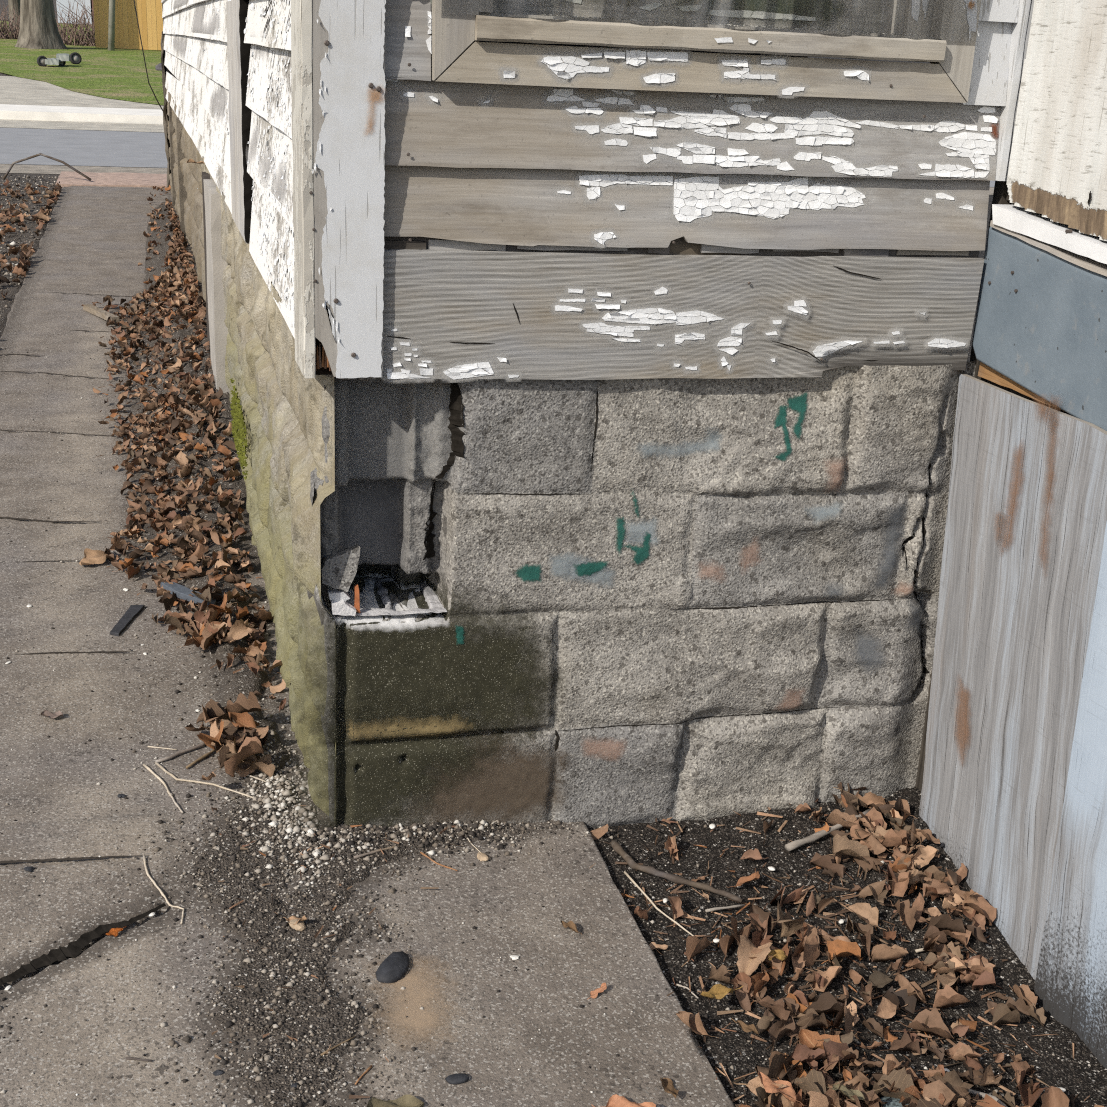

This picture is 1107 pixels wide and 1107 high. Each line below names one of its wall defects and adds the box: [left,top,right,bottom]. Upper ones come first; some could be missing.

peeling [538,38,1000,224]
peeling [553,285,752,372]
peeling [810,328,906,359]
peeling [925,336,967,350]
crack [422,381,465,561]
crack [472,490,573,498]
crack [590,390,598,472]
corrosion [998,450,1022,546]
spalling [321,544,360,616]
crack [670,463,931,680]
water stain [301,564,562,829]
crack [0,903,166,986]